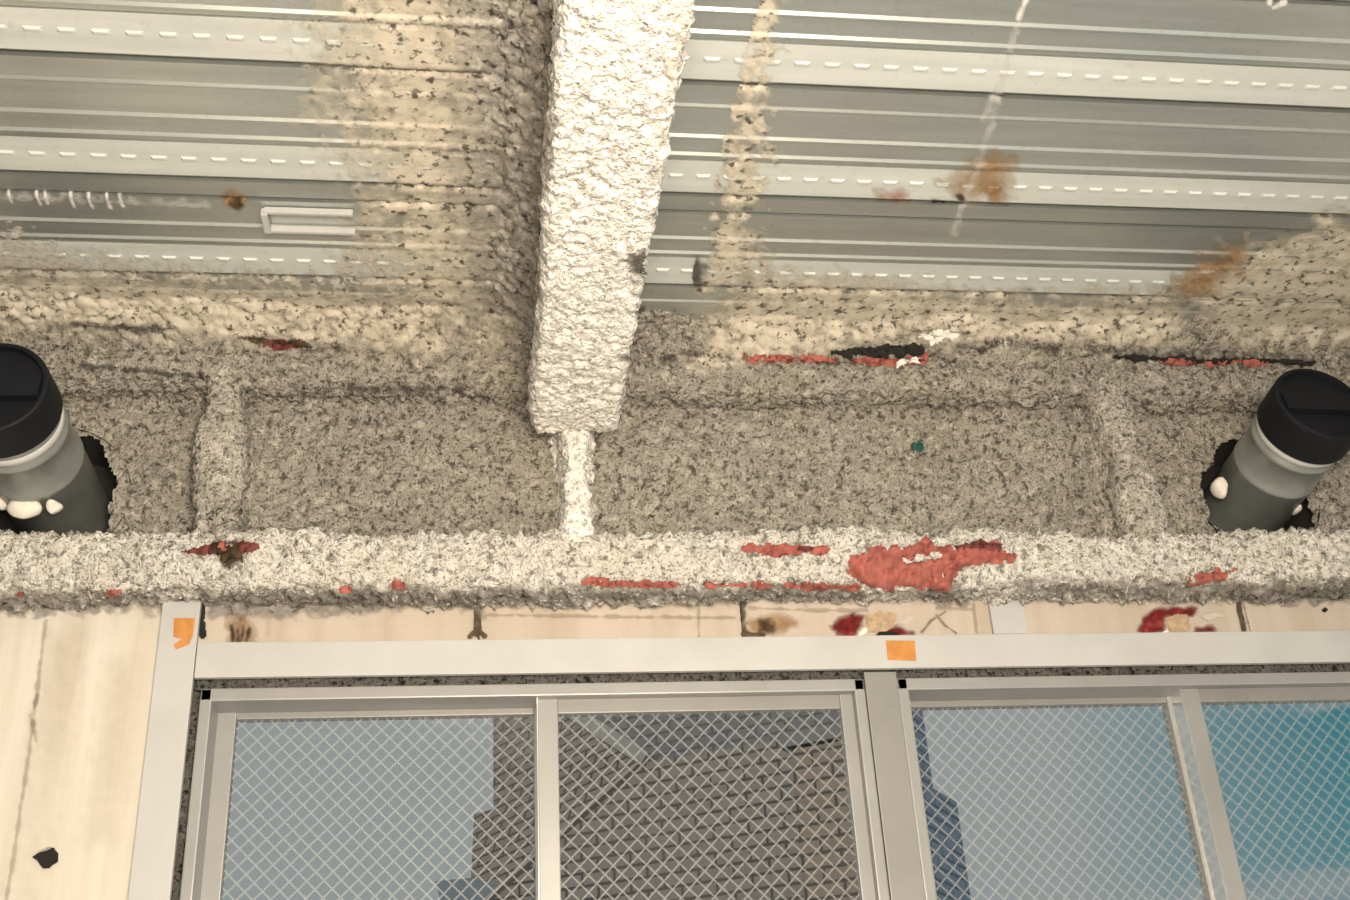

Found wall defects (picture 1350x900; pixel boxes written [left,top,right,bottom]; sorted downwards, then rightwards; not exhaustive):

corrosion [932,156,1010,203]
spalling [742,326,959,368]
spalling [181,540,260,568]
spalling [703,536,1018,594]
spalling [389,580,408,591]
spalling [581,576,679,590]
peeling [858,610,913,636]
peeling [1163,613,1224,632]